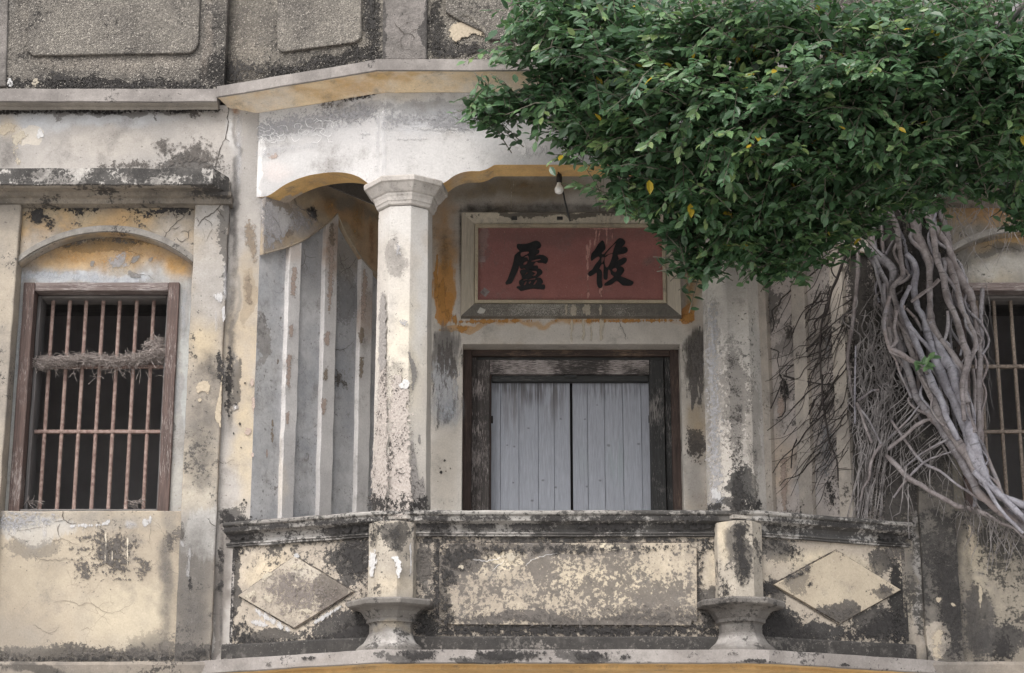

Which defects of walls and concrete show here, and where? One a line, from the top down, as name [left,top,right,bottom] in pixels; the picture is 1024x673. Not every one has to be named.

flaking render [449,13,486,42]
damp [97,136,230,173]
damp [24,208,99,232]
peeling [244,275,253,303]
peeling [432,246,532,428]
flaking render [215,357,255,435]
damp [685,433,706,465]
damp [69,516,166,581]
damp [164,526,201,626]
damp [215,467,807,663]
damp [929,535,977,662]
damp [0,638,212,662]